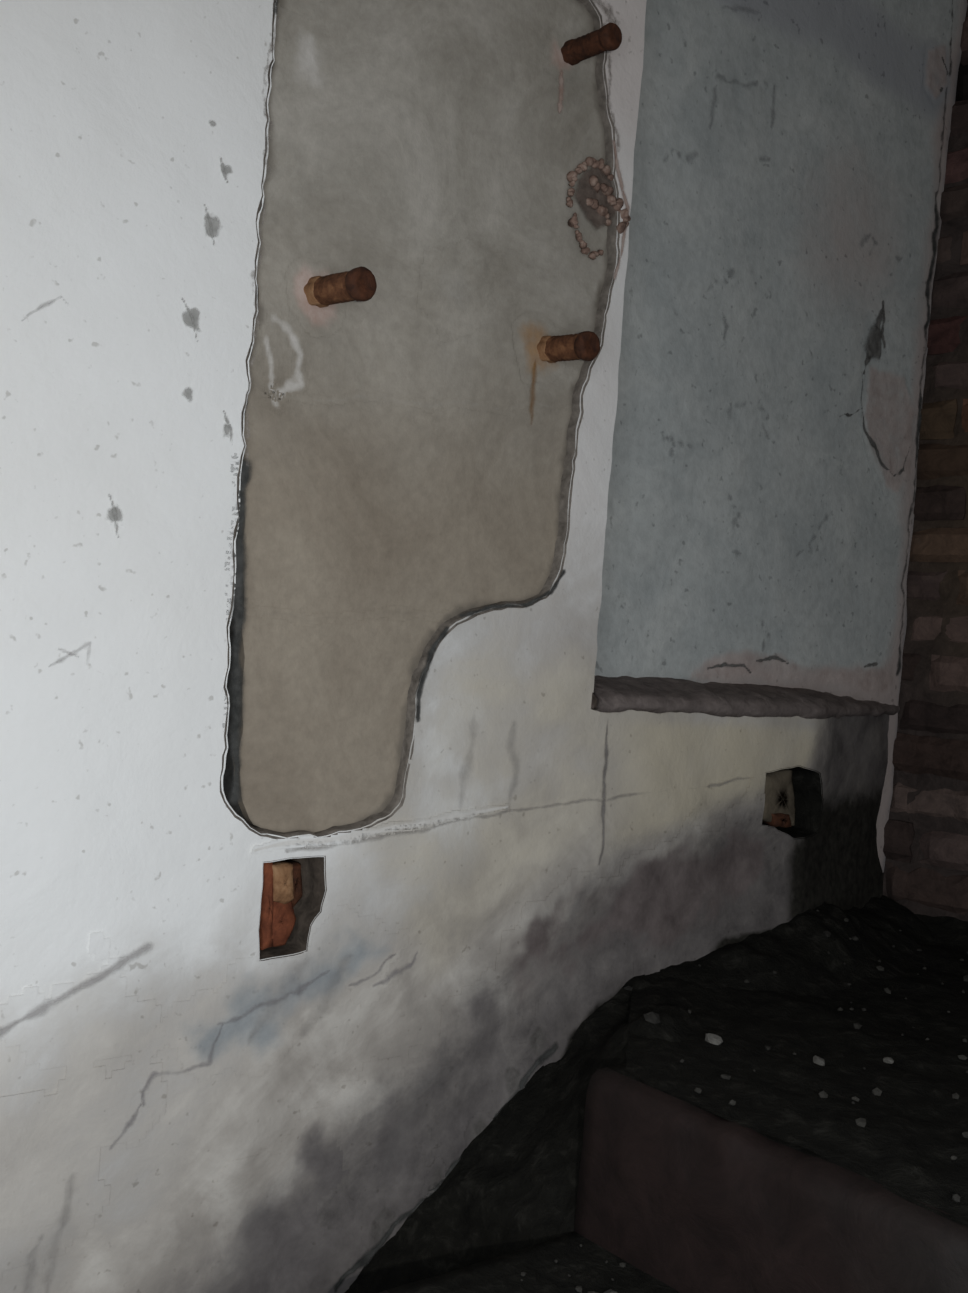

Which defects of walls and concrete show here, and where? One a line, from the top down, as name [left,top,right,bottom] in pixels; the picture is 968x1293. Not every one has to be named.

rust [285,256,346,339]
flaking render [220,0,631,839]
rust [511,311,565,386]
flaking render [845,301,919,502]
crack [252,804,526,854]
leakage [409,681,586,838]
crack [578,727,617,864]
spalling [258,856,327,961]
crack [0,945,149,1035]
leakage [0,905,409,1279]
leakage [184,778,784,1293]